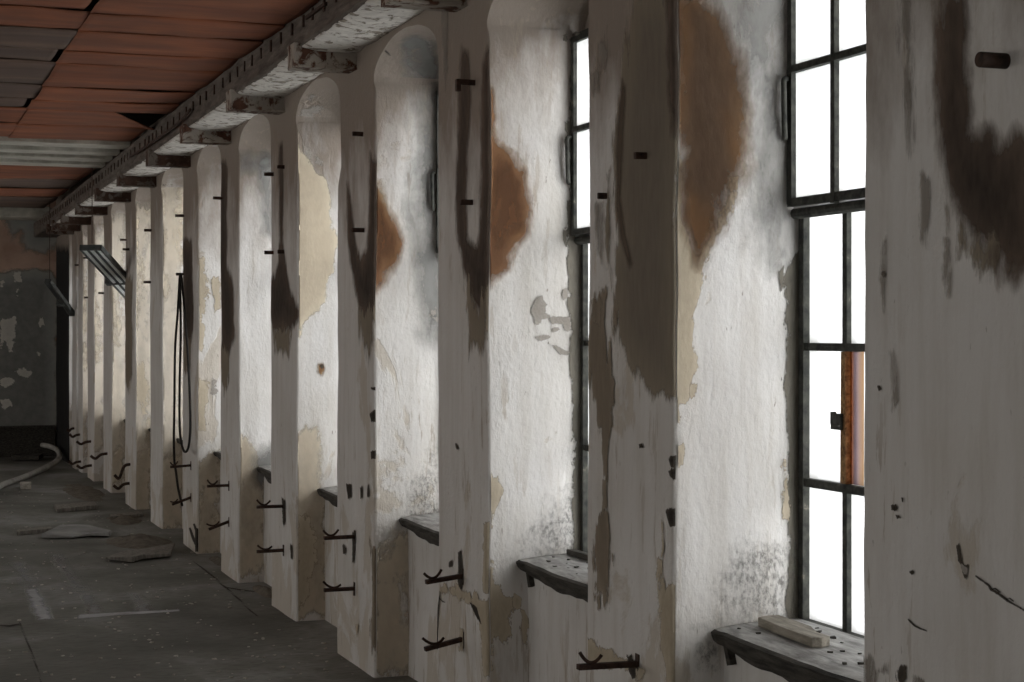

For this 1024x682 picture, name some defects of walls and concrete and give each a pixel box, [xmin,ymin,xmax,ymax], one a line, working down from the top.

peeling [0,268,57,456]
damp [245,145,299,355]
peeling [298,147,338,338]
damp [347,156,377,356]
damp [456,49,491,352]
peeling [531,69,617,611]
damp [594,0,678,401]
damp [736,0,787,216]
damp [920,173,930,239]
damp [934,0,1024,294]
peeling [440,474,529,677]
crack [975,575,1024,611]